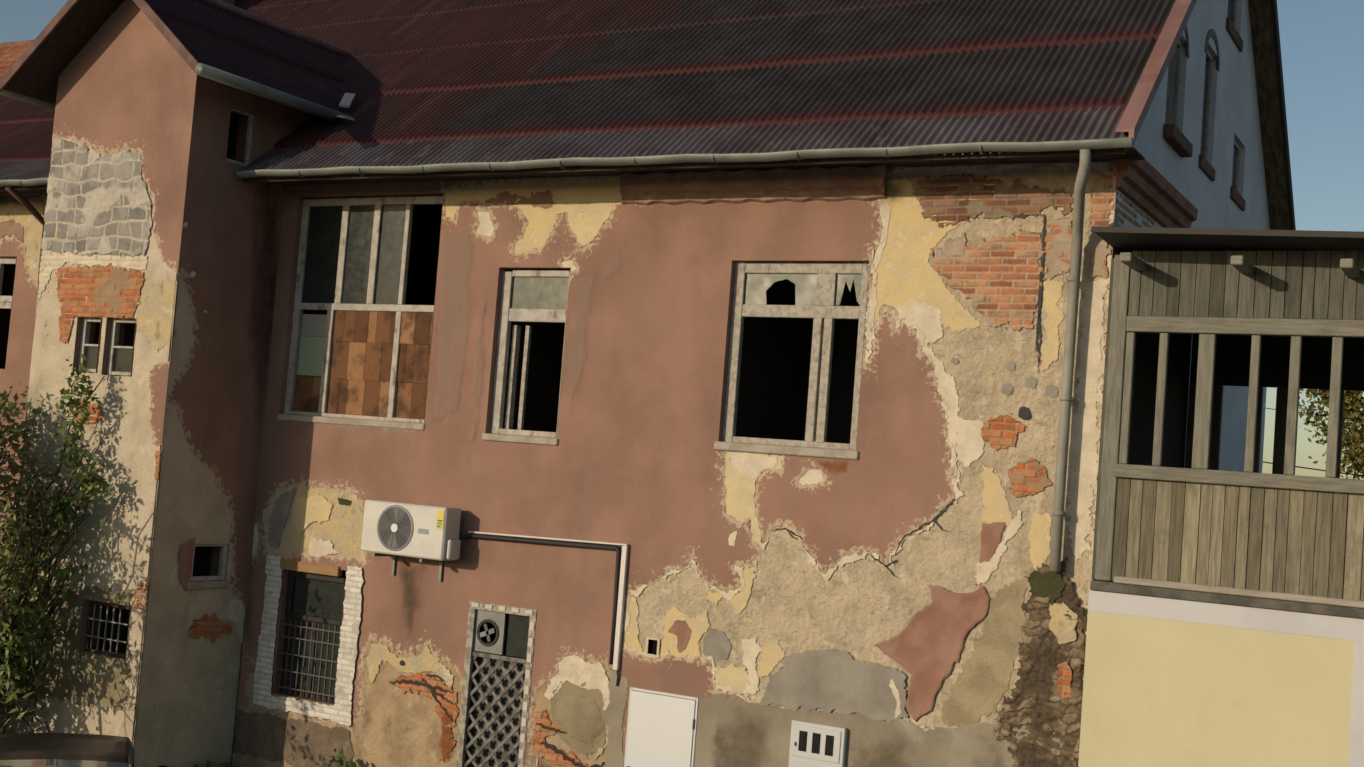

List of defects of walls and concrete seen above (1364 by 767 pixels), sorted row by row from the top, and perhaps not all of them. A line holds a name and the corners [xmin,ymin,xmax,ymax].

peeling [445,177,622,255]
peeling [562,260,576,275]
peeling [0,137,462,767]
peeling [622,162,1163,729]
crack [870,499,955,578]
peeling [531,655,613,767]